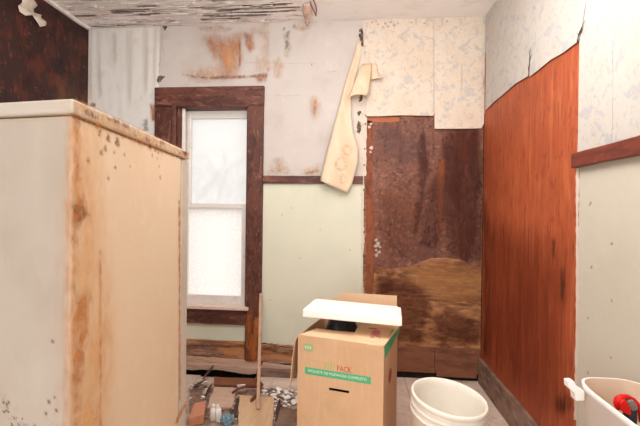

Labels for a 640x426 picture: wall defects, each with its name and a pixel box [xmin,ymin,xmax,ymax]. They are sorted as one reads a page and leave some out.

peeling [63,0,317,30]
spalling [355,95,372,134]
water stain [378,263,480,343]